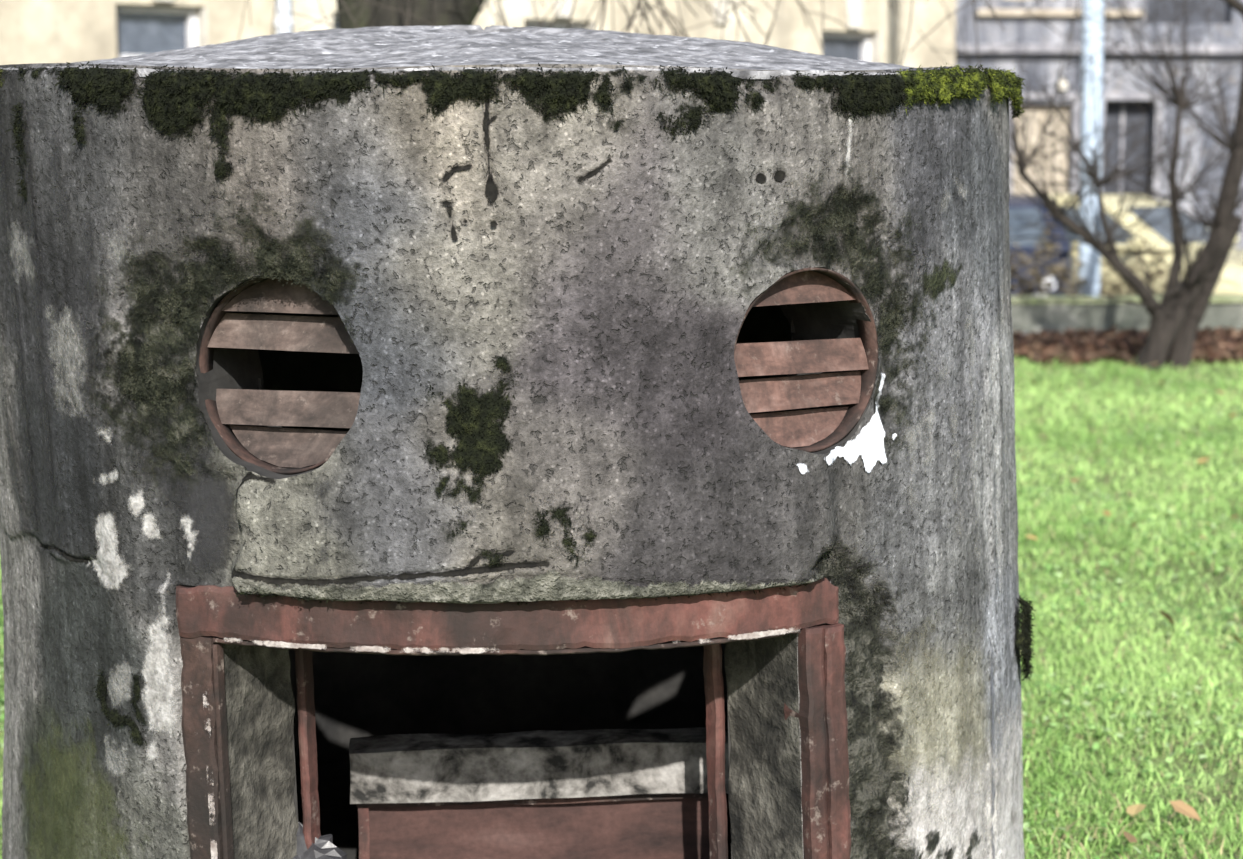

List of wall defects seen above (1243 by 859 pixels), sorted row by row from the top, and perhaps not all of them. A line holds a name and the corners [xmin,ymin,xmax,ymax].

spalling [731,164,935,458]
water stain [94,515,127,588]
water stain [131,495,159,538]
water stain [137,442,233,569]
water stain [895,649,1025,859]